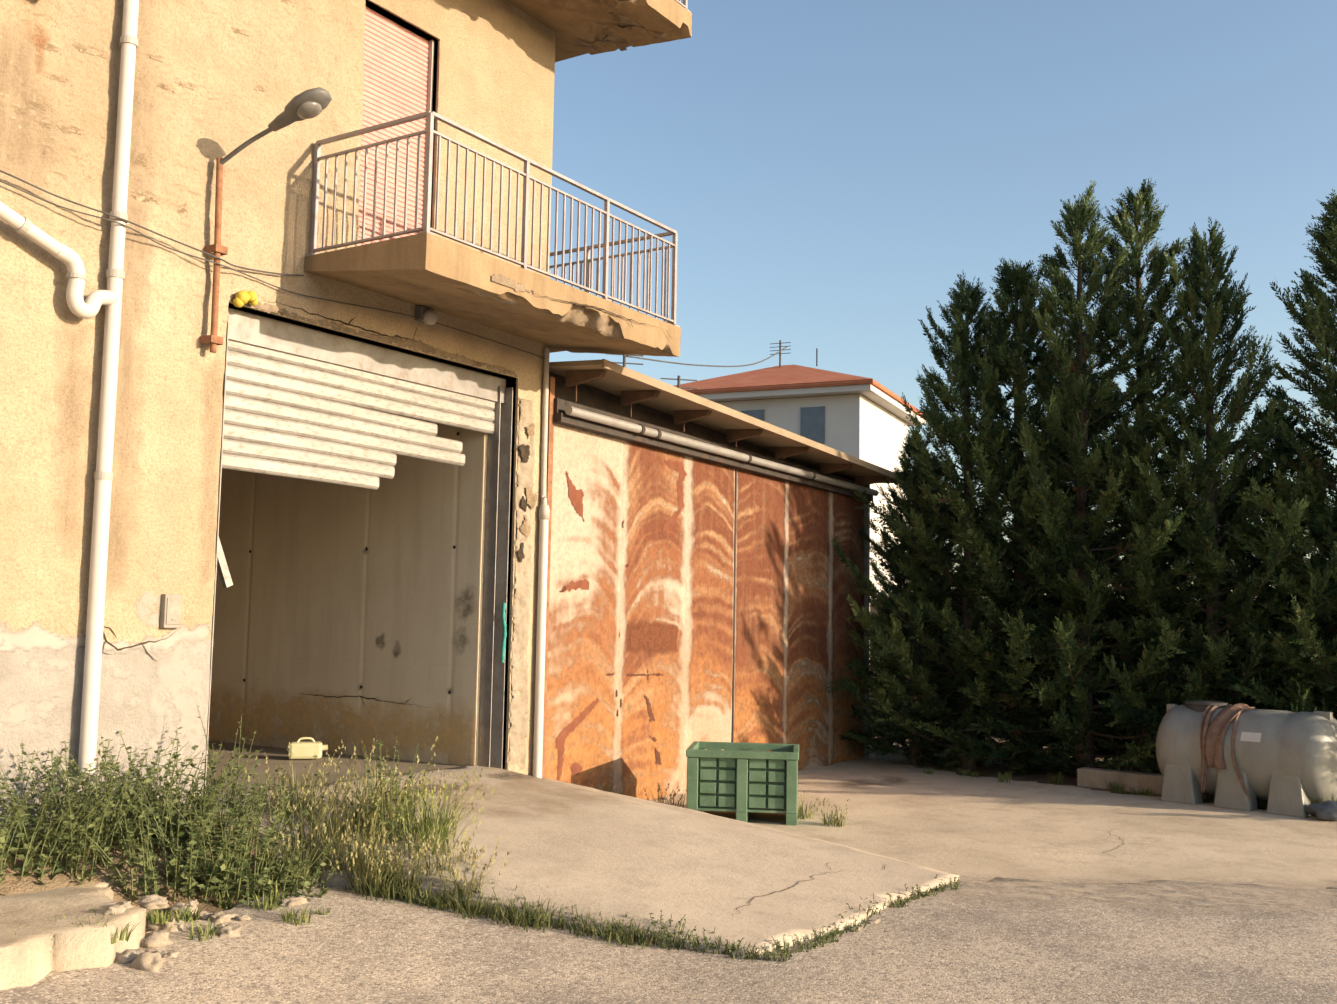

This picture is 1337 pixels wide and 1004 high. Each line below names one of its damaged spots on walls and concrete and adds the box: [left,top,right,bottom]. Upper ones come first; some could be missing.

spalling [577,0,668,52]
spalling [545,304,624,339]
spalling [637,345,672,356]
spalling [508,398,537,772]
peeling [0,622,86,670]
rust [545,442,864,800]
peeling [102,624,210,762]
damp [209,697,471,765]
crack [732,862,886,920]